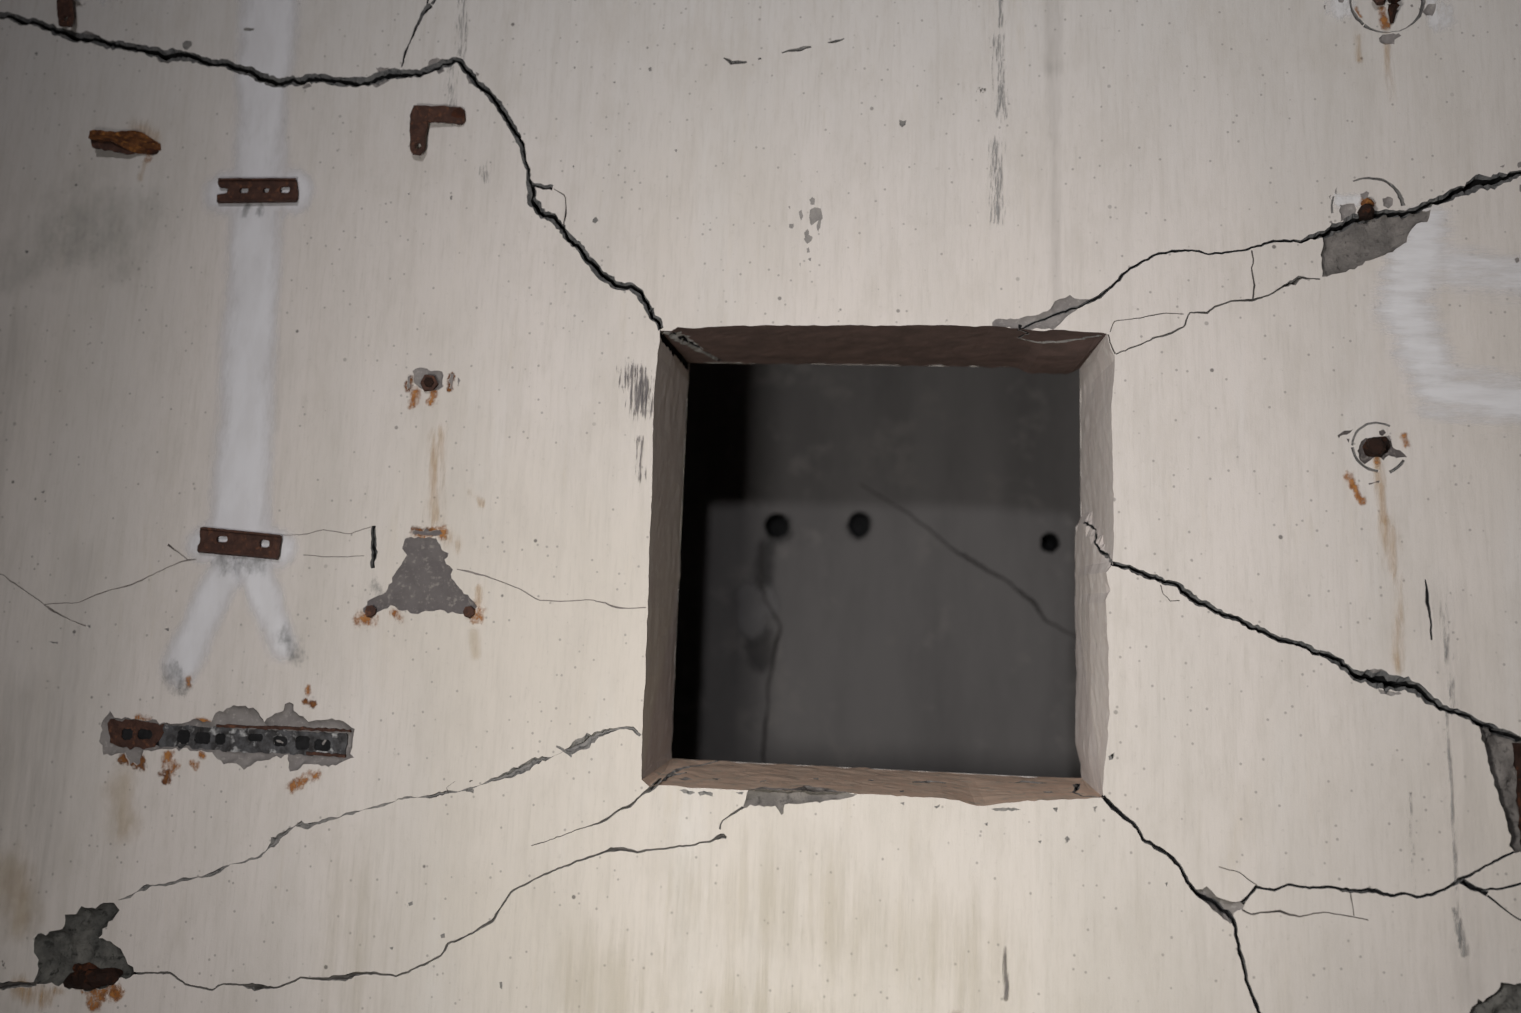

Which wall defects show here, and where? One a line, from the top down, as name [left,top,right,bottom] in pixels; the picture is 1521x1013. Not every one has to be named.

damp [165,0,312,684]
crack [0,0,722,371]
crack [1017,170,1521,355]
peeling [363,526,477,614]
crack [0,981,38,990]
spalling [34,903,134,992]
spalling [99,702,355,772]
crack [119,726,641,900]
crack [136,761,744,991]
crack [1072,784,1521,1013]
spalling [1469,982,1521,1013]
spalling [1479,727,1521,853]